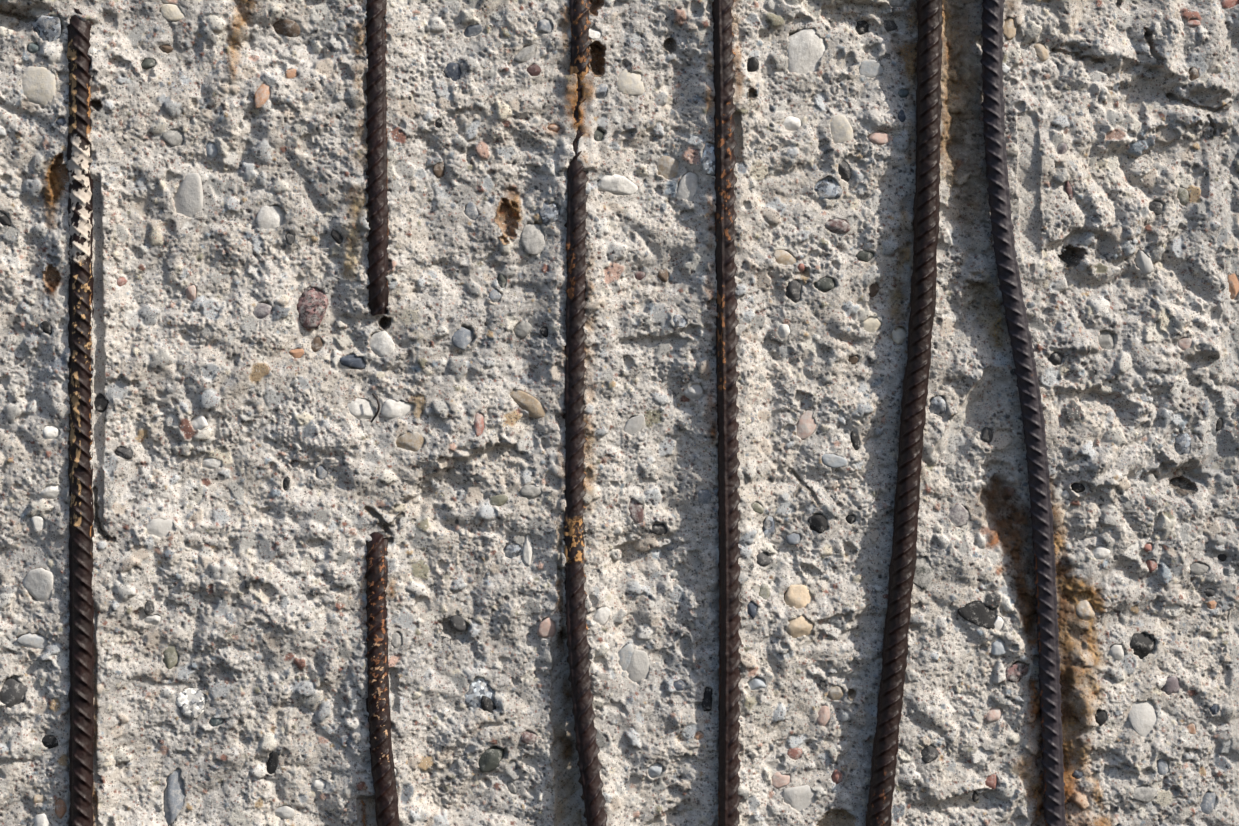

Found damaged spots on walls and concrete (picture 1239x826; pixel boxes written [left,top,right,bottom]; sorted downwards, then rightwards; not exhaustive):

corrosion [44,168,62,206]
spalling [364,0,496,331]
corrosion [498,188,521,219]
corrosion [567,82,592,131]
corrosion [941,12,963,146]
spalling [0,0,103,826]
spalling [563,0,607,826]
spalling [609,0,757,826]
spalling [791,0,1142,826]
spalling [331,532,400,826]
corrosion [986,476,1037,645]
corrosion [1053,512,1104,801]